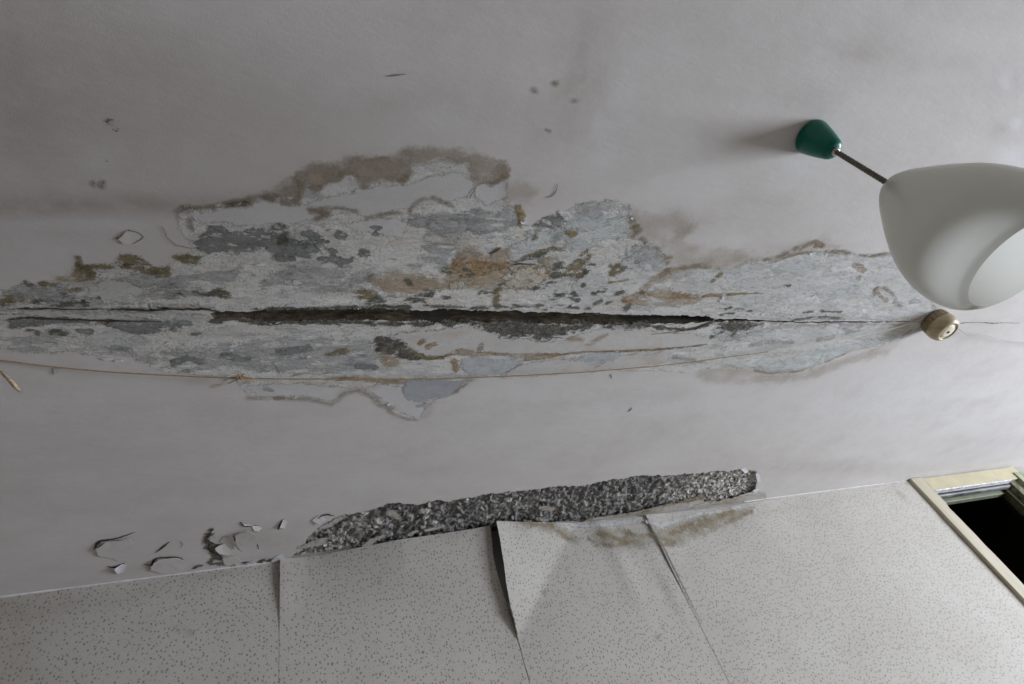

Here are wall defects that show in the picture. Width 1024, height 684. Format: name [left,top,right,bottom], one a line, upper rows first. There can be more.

damp [178,149,509,230]
crack [12,293,910,342]
peeling [0,158,937,421]
peeling [94,532,135,574]
spalling [147,522,272,574]
spalling [294,468,767,556]